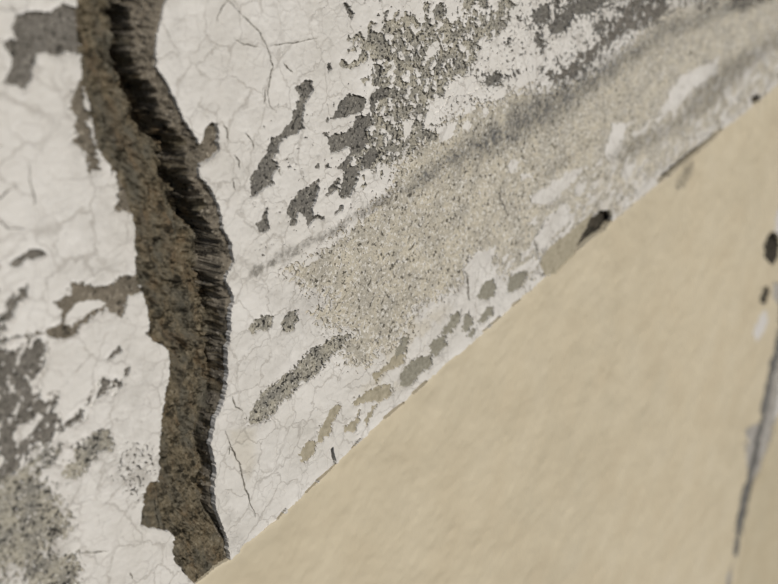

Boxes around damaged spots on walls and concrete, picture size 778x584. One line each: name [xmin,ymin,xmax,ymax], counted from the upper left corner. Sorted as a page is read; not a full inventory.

peeling [3,2,78,89]
peeling [0,275,141,584]
peeling [118,443,153,495]
crack [75,0,256,583]
peeling [298,402,341,462]
peeling [244,0,778,433]
crack [726,210,778,584]